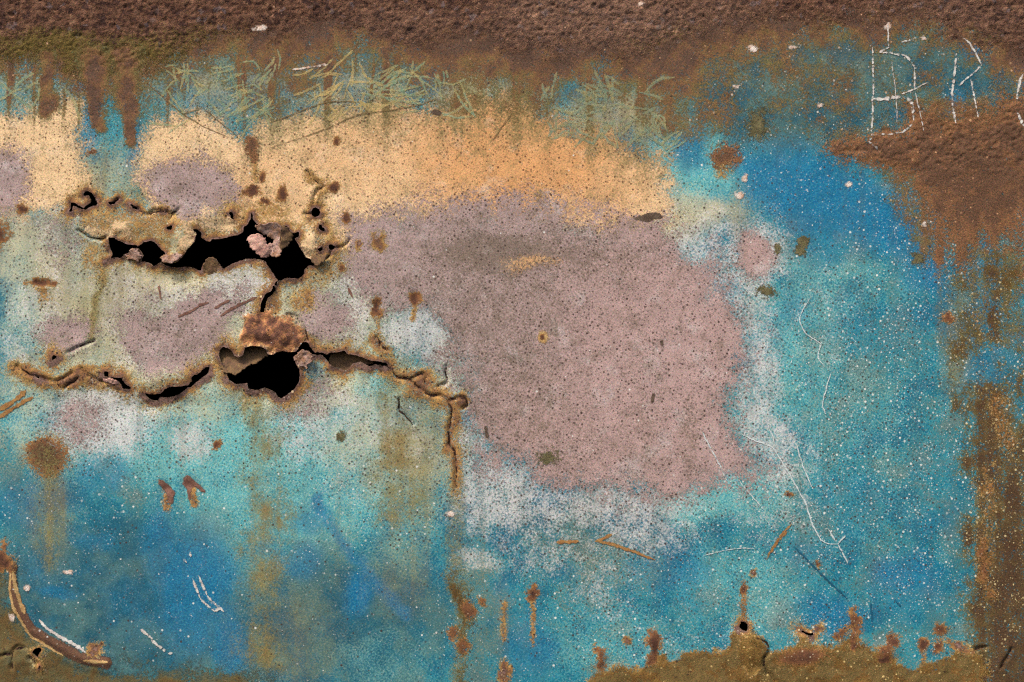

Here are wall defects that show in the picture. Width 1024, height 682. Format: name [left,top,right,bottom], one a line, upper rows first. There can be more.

peeling [125,248,142,262]
peeling [30,257,269,385]
peeling [130,83,783,518]
corrosion [0,0,1024,386]
corrosion [18,429,75,497]
peeling [49,395,110,453]
crack [366,329,471,499]
corrosion [585,343,1024,682]
corrosion [0,537,281,682]
corrosion [441,532,486,682]
corrosion [497,601,513,682]
corrosion [524,582,540,647]